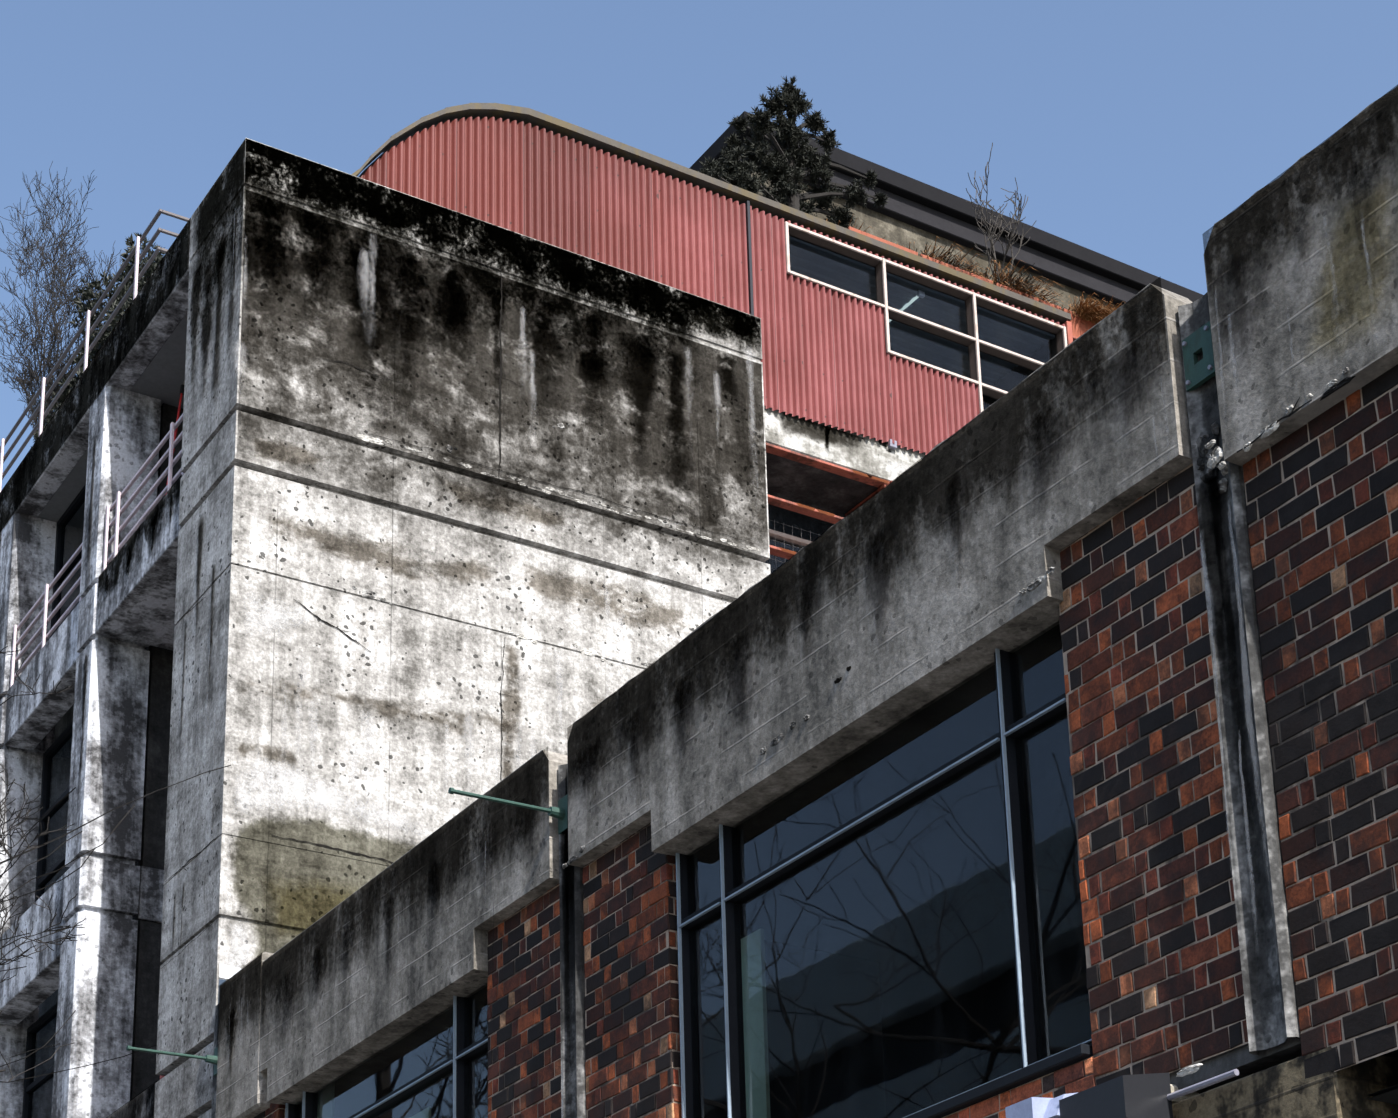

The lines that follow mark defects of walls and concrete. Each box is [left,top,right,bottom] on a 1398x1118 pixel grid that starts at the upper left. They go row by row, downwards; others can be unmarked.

water stain [0,138,761,532]